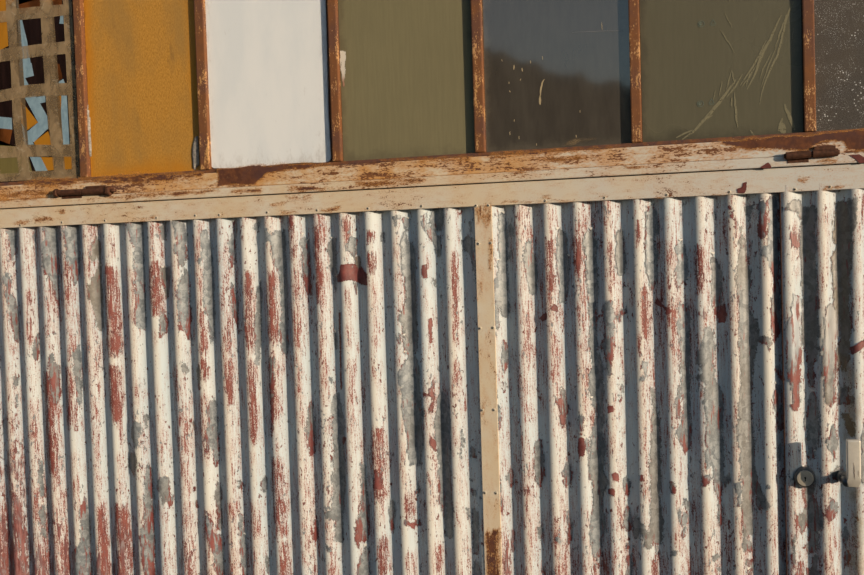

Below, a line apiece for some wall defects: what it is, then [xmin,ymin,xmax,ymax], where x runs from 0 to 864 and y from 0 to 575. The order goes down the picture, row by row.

corrosion [0,163,330,201]
corrosion [272,186,325,214]
corrosion [356,178,425,186]
corrosion [722,129,864,151]
peeling [493,212,514,329]
peeling [0,334,175,575]
peeling [41,215,385,467]
peeling [312,312,422,575]
peeling [393,208,476,573]
peeling [523,195,864,575]
peeling [465,507,482,575]
corrosion [485,529,501,575]